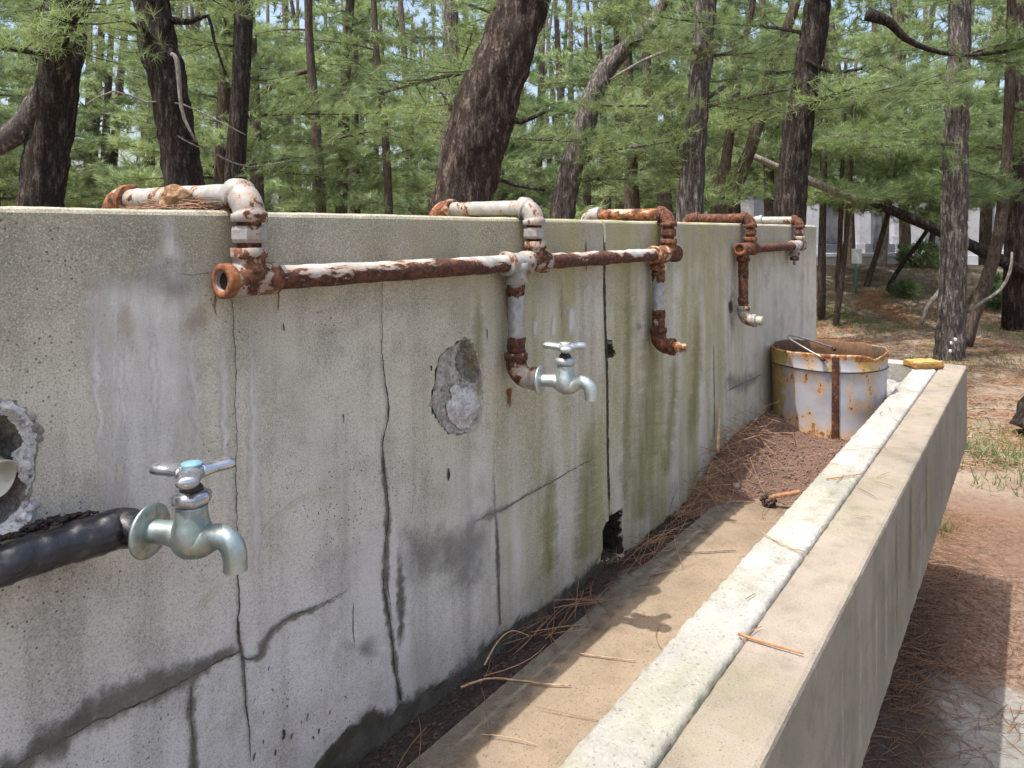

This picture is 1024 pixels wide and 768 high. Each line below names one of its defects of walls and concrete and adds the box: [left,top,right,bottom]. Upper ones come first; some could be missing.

damp [164,226,181,259]
damp [90,272,200,513]
crack [231,302,239,531]
spalling [429,337,484,434]
crack [477,243,610,521]
spalling [0,399,44,544]
crack [381,282,402,701]
crack [210,575,252,667]
crack [317,593,354,638]
crack [72,687,175,736]
crack [244,697,252,757]